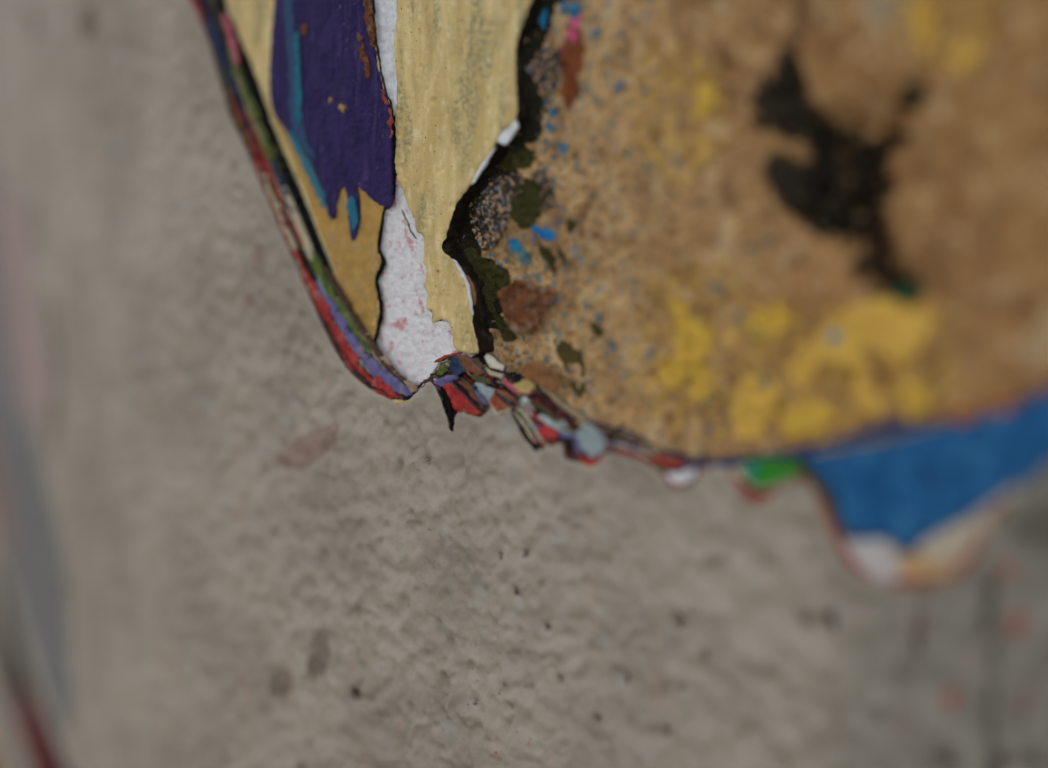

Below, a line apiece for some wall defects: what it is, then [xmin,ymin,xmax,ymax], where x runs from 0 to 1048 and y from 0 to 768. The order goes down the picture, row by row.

peeling [191,0,1048,589]